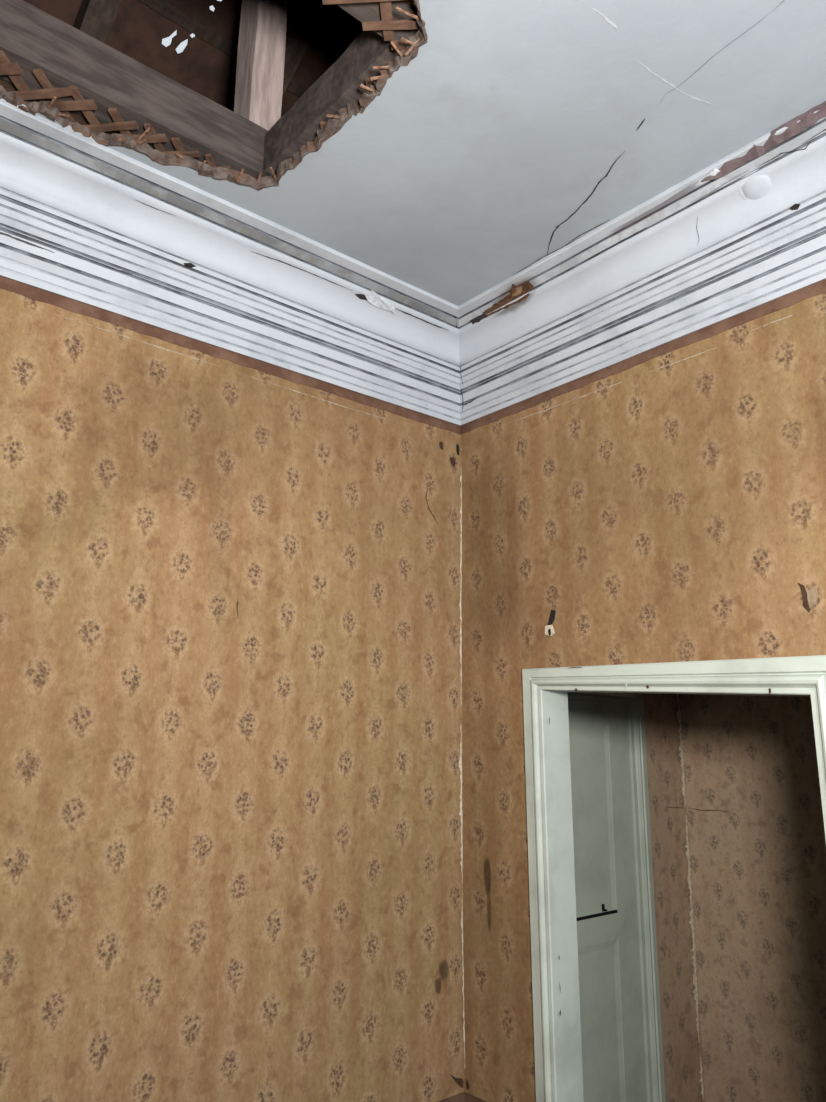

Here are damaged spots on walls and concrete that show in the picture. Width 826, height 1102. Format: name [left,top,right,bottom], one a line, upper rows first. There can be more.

peeling [3,94,55,122]
peeling [359,75,388,108]
crack [515,1,783,294]
peeling [695,101,826,186]
peeling [198,168,214,177]
crack [690,129,826,245]
spalling [470,281,534,324]
peeling [807,586,818,609]